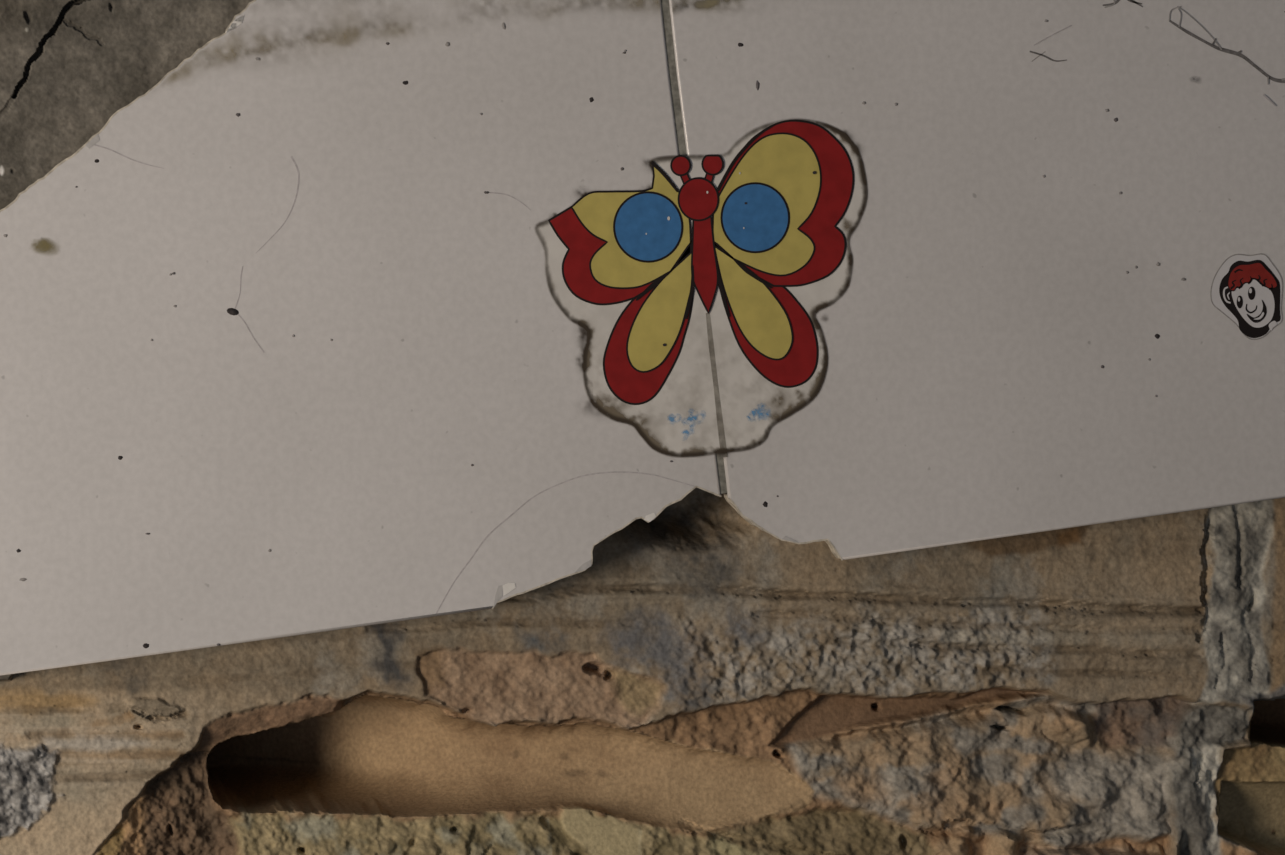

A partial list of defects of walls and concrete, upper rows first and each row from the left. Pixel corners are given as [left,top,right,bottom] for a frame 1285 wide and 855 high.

crack [0,0,107,120]
spalling [91,644,1285,855]